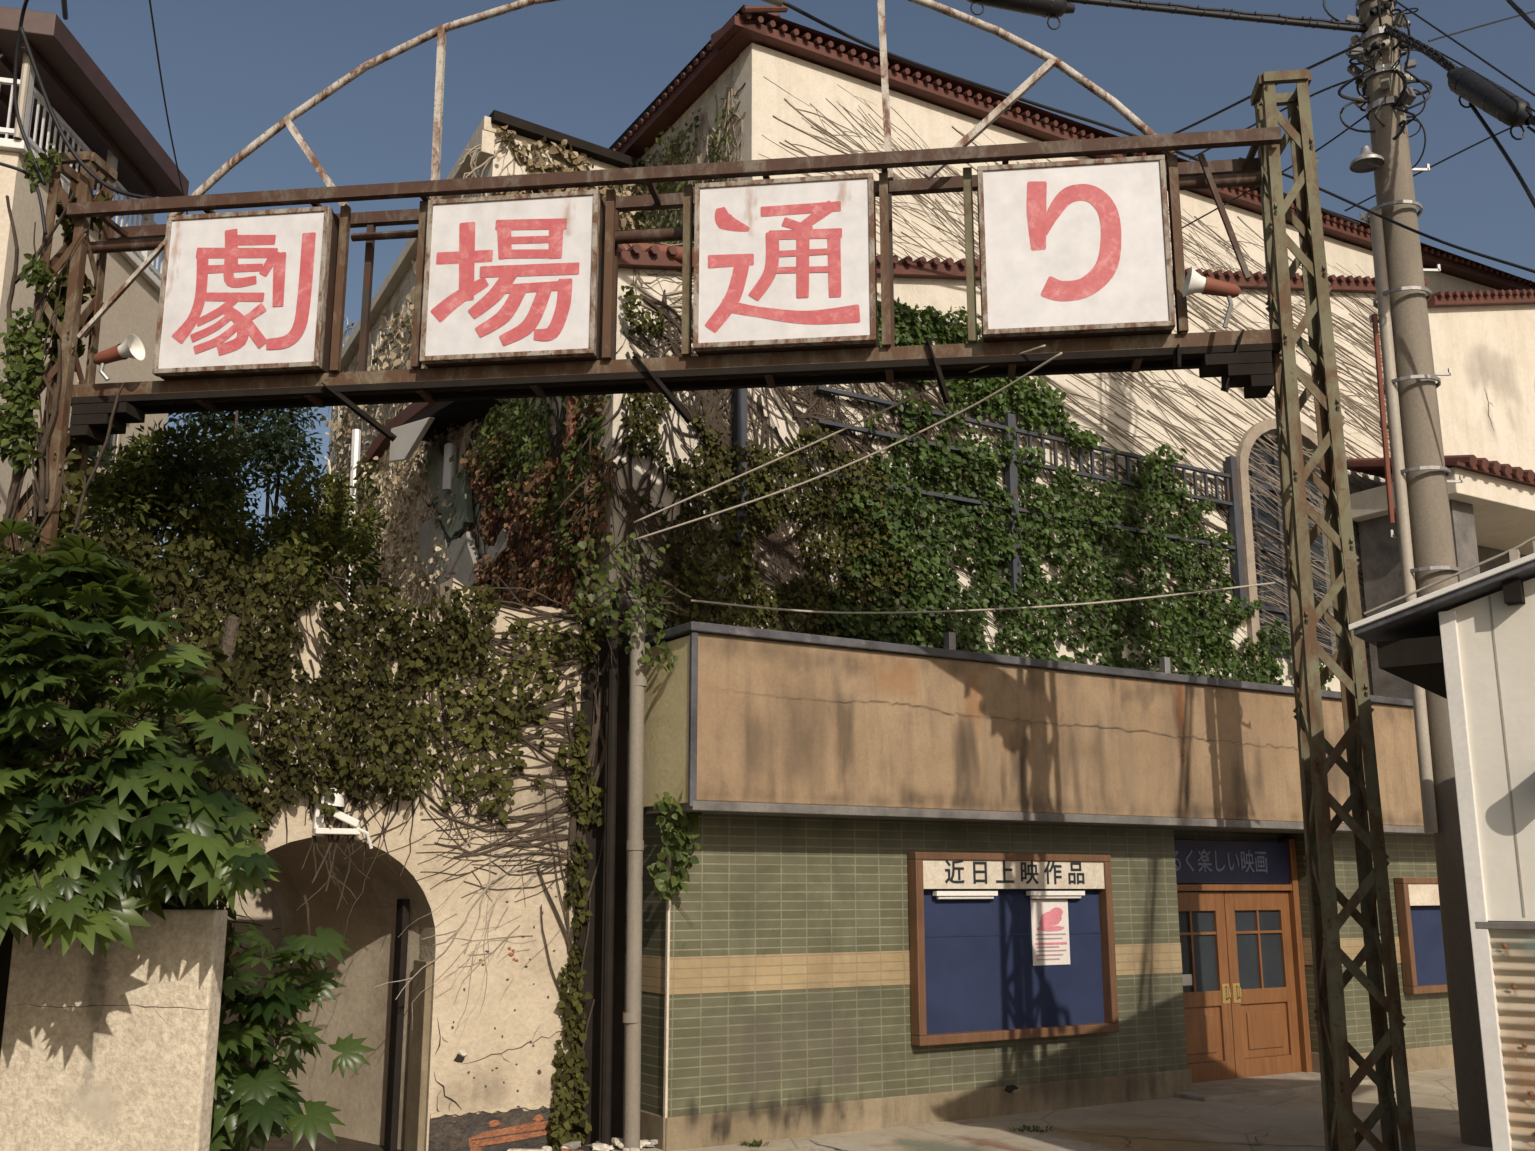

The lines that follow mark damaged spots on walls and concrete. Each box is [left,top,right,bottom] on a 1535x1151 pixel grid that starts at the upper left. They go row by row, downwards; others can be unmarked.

peeling [428,1049,569,1151]